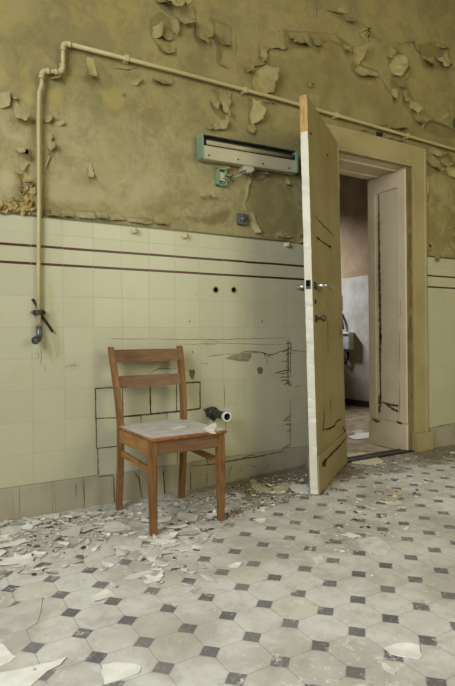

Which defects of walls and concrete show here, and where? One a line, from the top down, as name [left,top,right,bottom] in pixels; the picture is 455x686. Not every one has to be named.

peeling [148,0,233,68]
peeling [0,91,32,129]
peeling [43,115,68,172]
peeling [47,73,65,85]
peeling [130,74,178,89]
peeling [206,85,232,134]
peeling [244,3,455,212]
peeling [0,146,173,227]
peeling [241,170,303,243]
spalling [223,352,252,362]
crack [95,366,201,502]
crack [163,337,304,494]